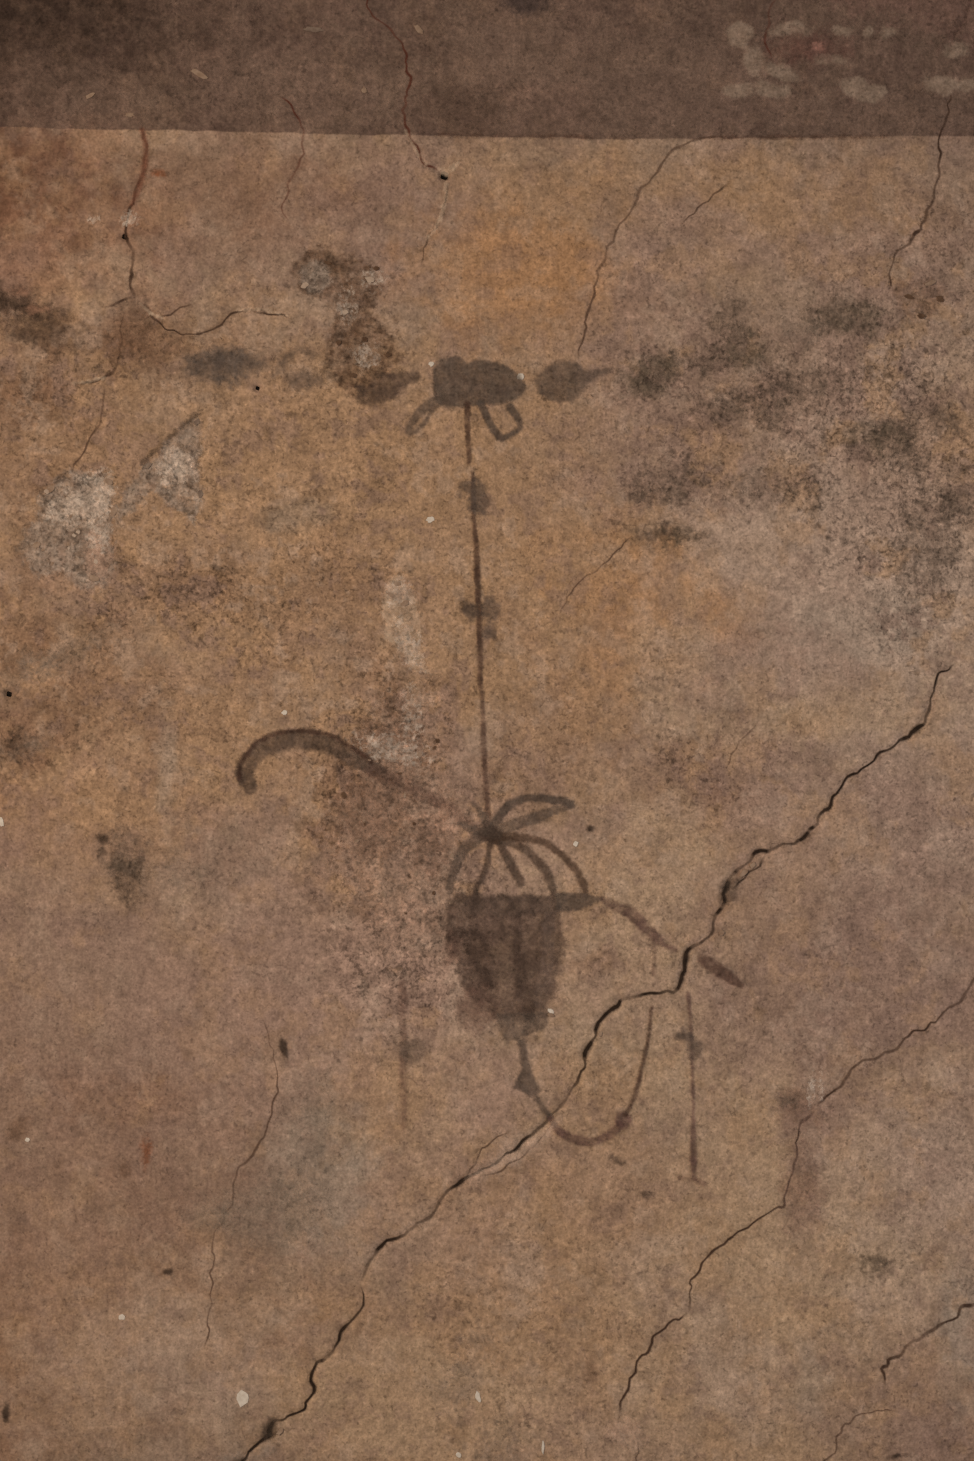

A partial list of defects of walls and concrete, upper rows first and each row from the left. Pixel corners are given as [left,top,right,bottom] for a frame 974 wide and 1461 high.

crack [90,191,136,303]
crack [154,306,285,335]
crack [578,287,596,351]
spalling [23,418,203,588]
crack [576,668,950,1084]
crack [250,1075,279,1158]
crack [449,1133,534,1190]
crack [376,1235,402,1251]
crack [619,1080,840,1408]
crack [937,1304,972,1327]
crack [241,1292,364,1461]
crack [881,1354,901,1410]